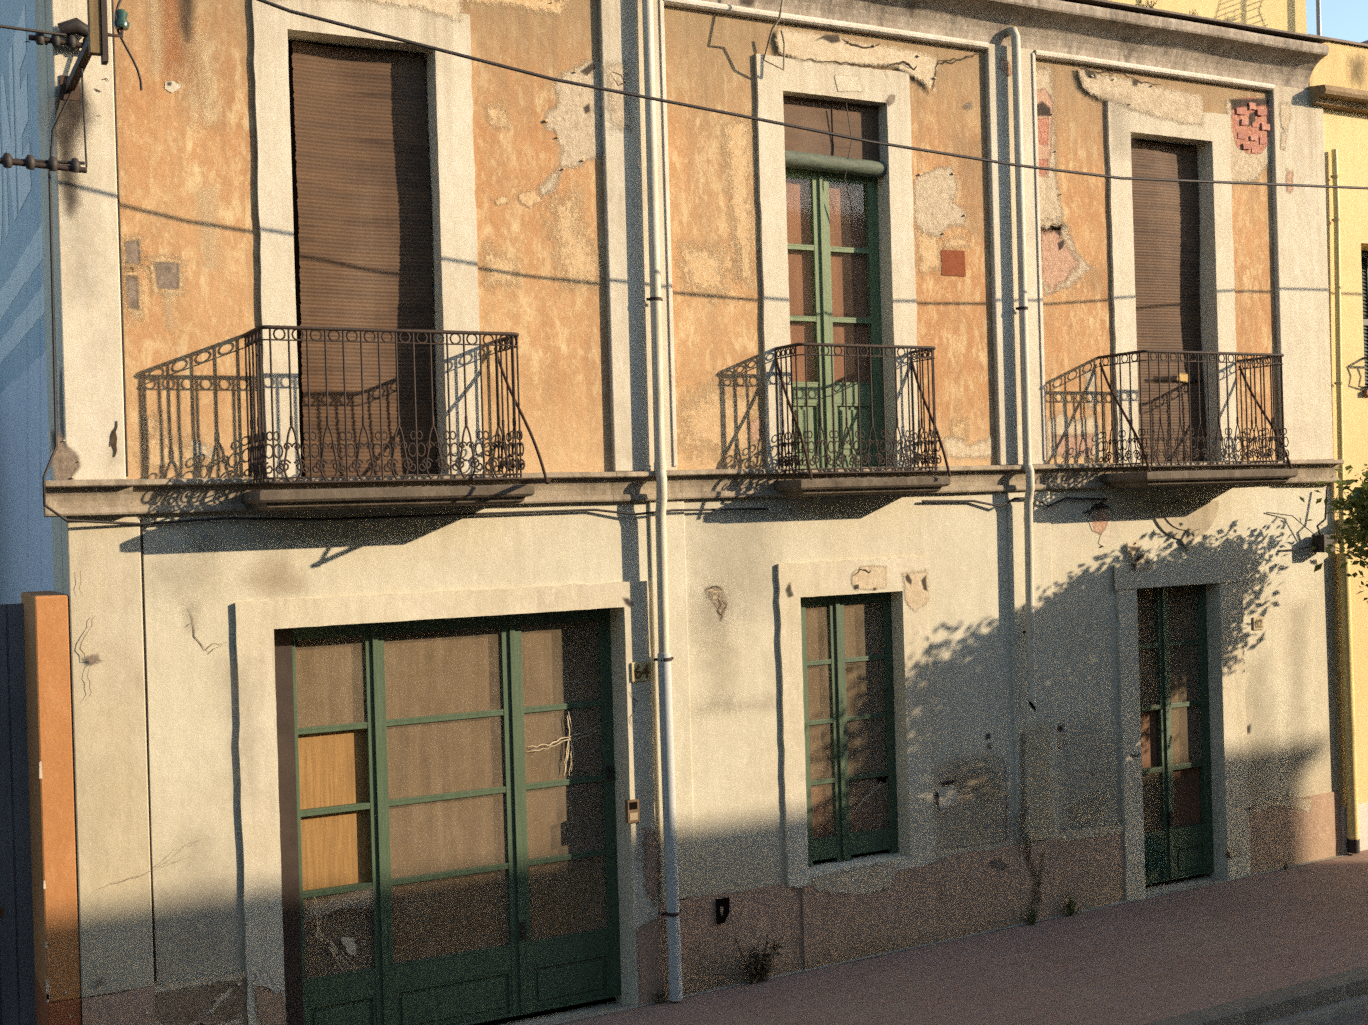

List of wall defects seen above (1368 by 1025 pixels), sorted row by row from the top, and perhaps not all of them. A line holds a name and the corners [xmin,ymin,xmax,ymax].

flaking render [776,28,982,91]
flaking render [1079,68,1204,125]
peeling [495,60,606,292]
flaking render [1036,67,1091,296]
peeling [914,166,968,277]
peeling [481,241,521,288]
flaking render [1083,502,1112,547]
spalling [852,565,930,611]
crack [79,571,100,699]
crack [187,609,226,651]
flaking render [935,780,958,810]
flaking render [146,971,286,1025]